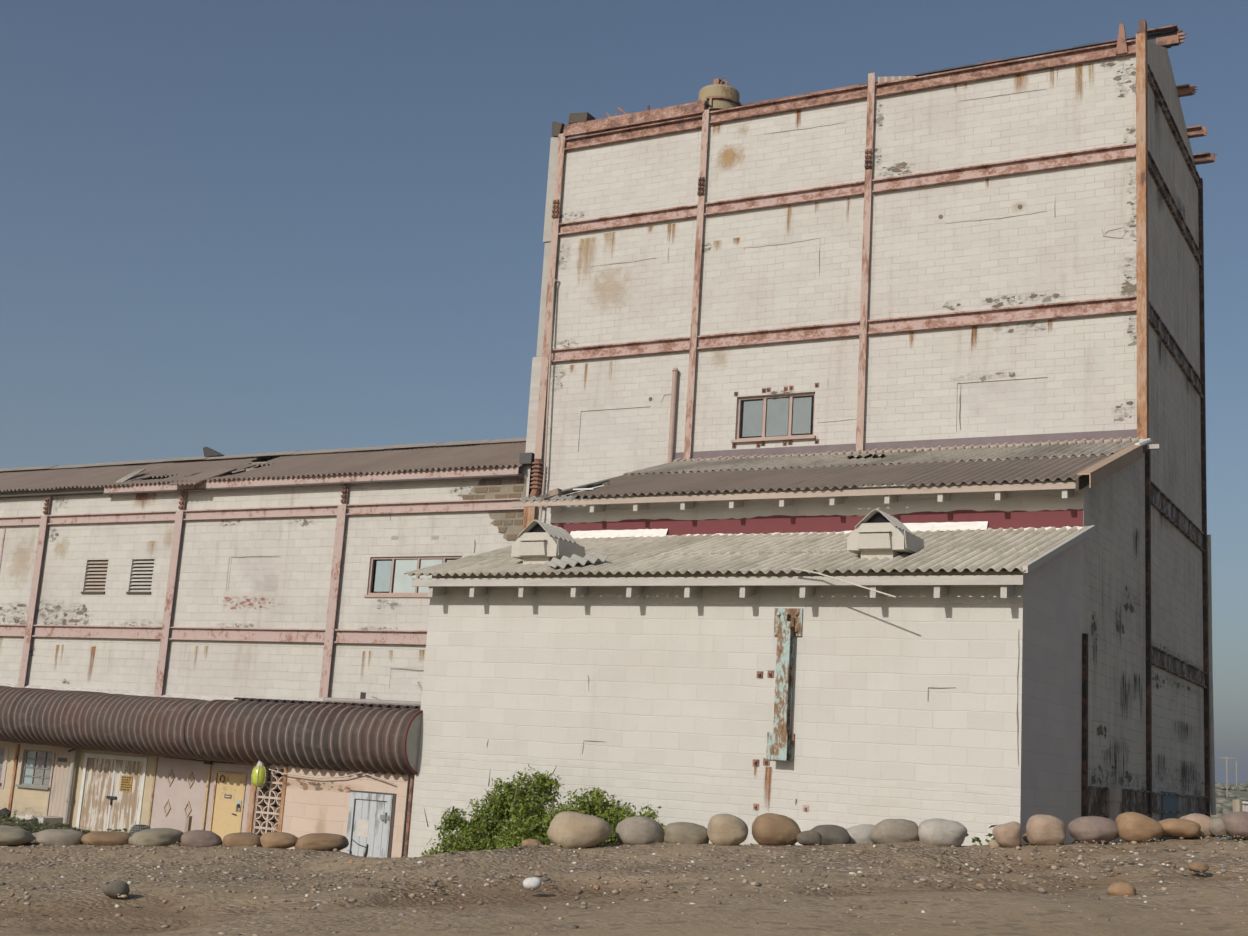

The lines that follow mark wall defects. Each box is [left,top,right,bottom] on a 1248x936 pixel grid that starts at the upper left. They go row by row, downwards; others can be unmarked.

peeling [1100,58,1136,97]
peeling [874,148,912,176]
peeling [986,293,1060,308]
peeling [0,602,89,625]
peeling [224,597,271,609]